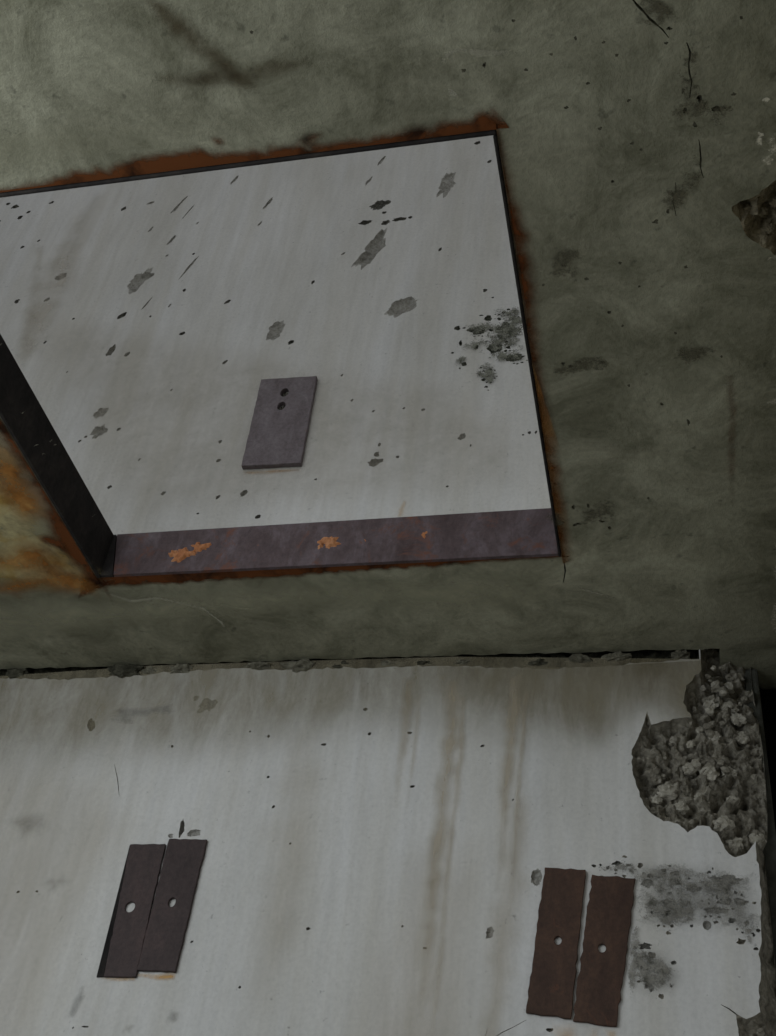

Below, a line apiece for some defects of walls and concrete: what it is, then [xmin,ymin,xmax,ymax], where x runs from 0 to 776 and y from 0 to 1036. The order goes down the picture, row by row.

corrosion [0,113,569,597]
spalling [732,180,776,255]
spalling [591,648,776,1036]